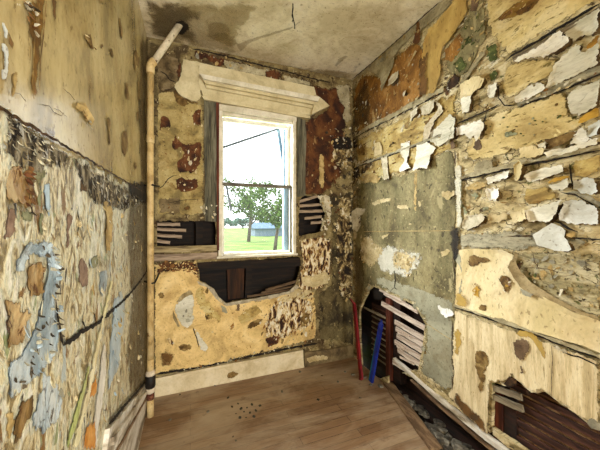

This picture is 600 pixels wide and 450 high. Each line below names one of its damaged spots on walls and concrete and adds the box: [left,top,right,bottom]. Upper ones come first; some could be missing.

water stain [153,4,198,34]
peeling [0,108,143,450]
water stain [4,40,173,390]
crack [56,270,147,346]
flaking render [154,0,600,391]
spalling [492,338,600,450]